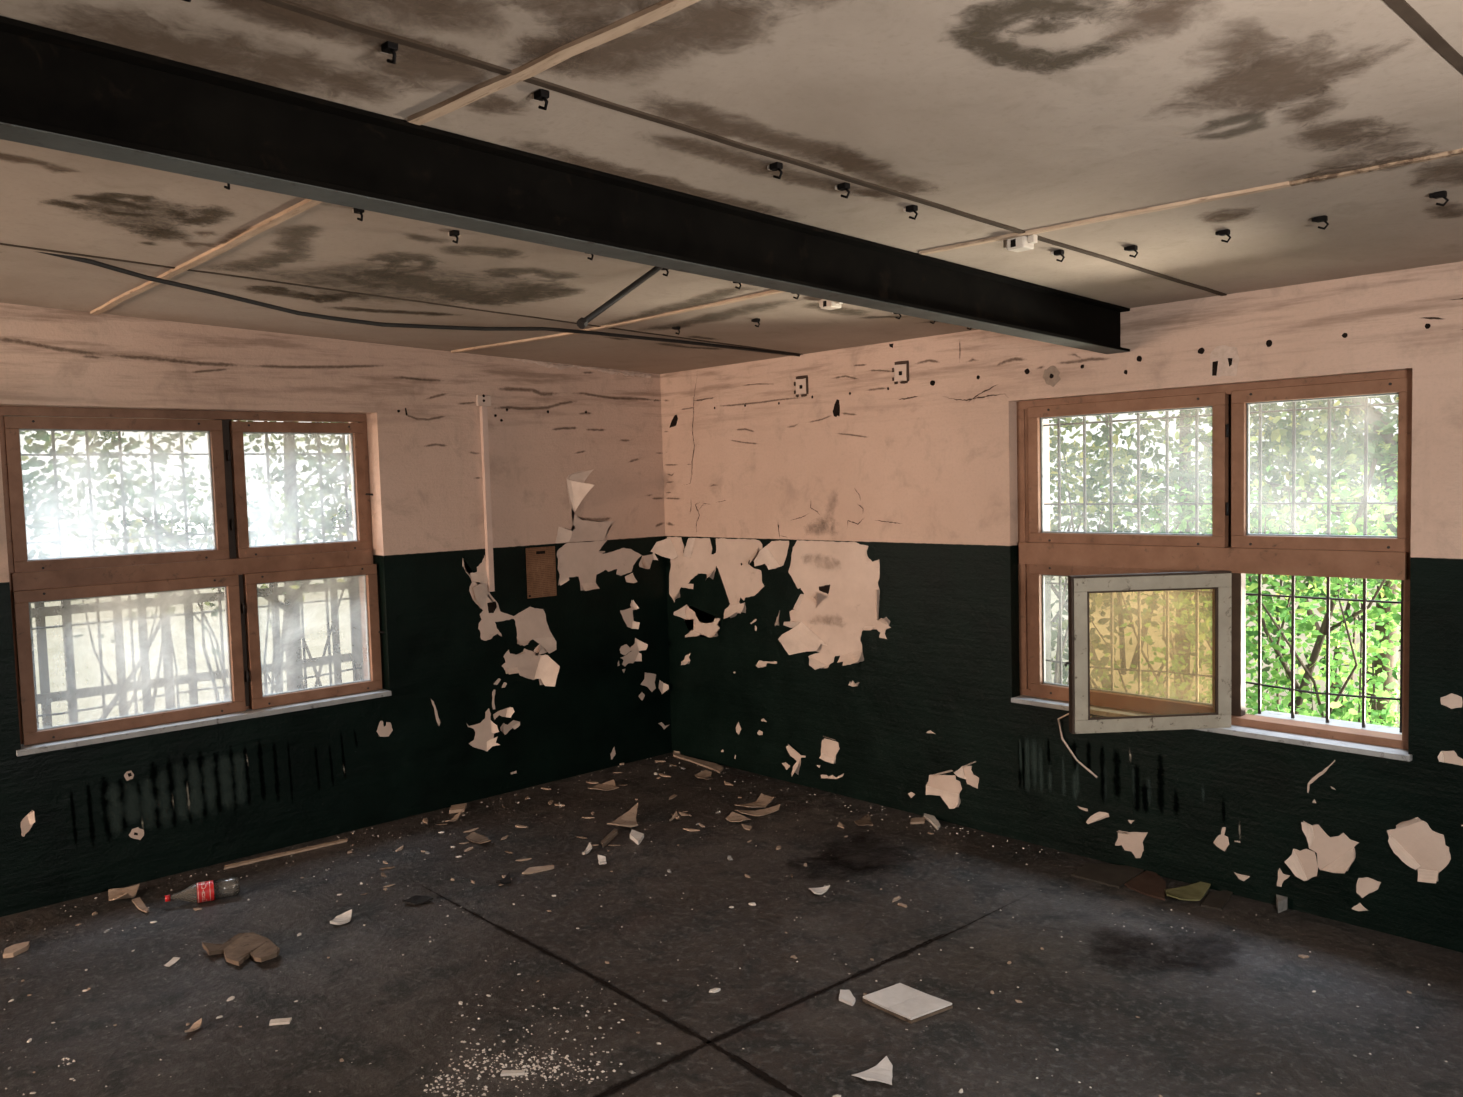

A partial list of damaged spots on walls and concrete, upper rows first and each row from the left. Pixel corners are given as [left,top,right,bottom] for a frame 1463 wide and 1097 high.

leakage [515,0,760,73]
leakage [952,0,1196,72]
leakage [1194,31,1463,184]
leakage [0,154,69,172]
leakage [48,193,249,247]
leakage [224,226,580,316]
peeling [556,527,891,700]
peeling [462,556,560,751]
peeling [782,736,844,779]
peeling [908,761,979,809]
peeling [1277,821,1381,911]
peeling [1387,817,1451,883]